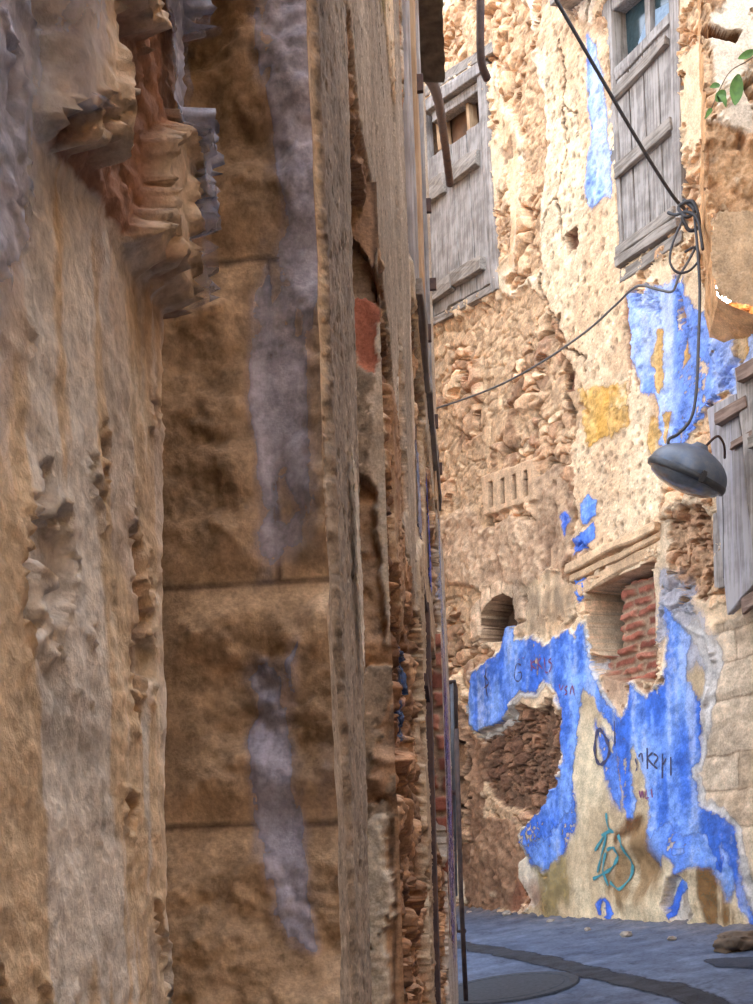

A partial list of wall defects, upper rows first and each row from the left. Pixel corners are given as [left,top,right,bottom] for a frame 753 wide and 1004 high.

spalling [47,0,208,319]
spalling [343,0,373,207]
spalling [377,0,753,1004]